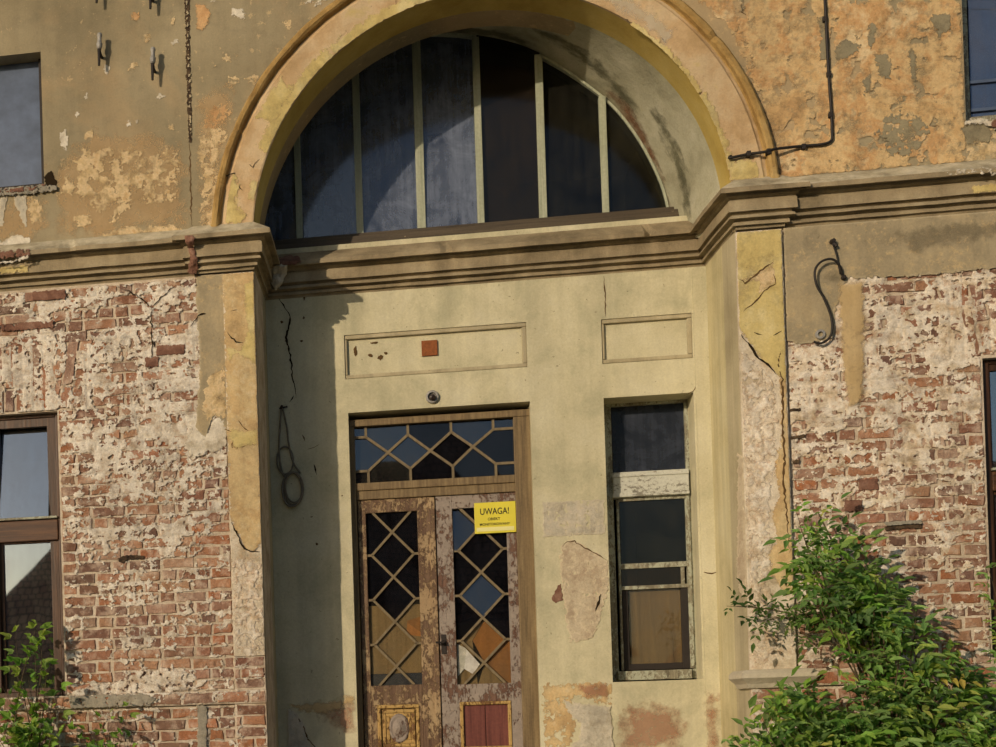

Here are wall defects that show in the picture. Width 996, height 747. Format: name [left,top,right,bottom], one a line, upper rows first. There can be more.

peeling [171,0,215,83]
peeling [698,0,996,177]
peeling [0,129,182,236]
peeling [188,95,232,225]
peeling [0,234,30,245]
crack [122,285,176,358]
crack [279,299,296,401]
crack [740,262,776,308]
peeling [0,272,266,747]
crack [741,331,791,550]
peeling [741,268,996,668]
peeling [552,539,609,643]